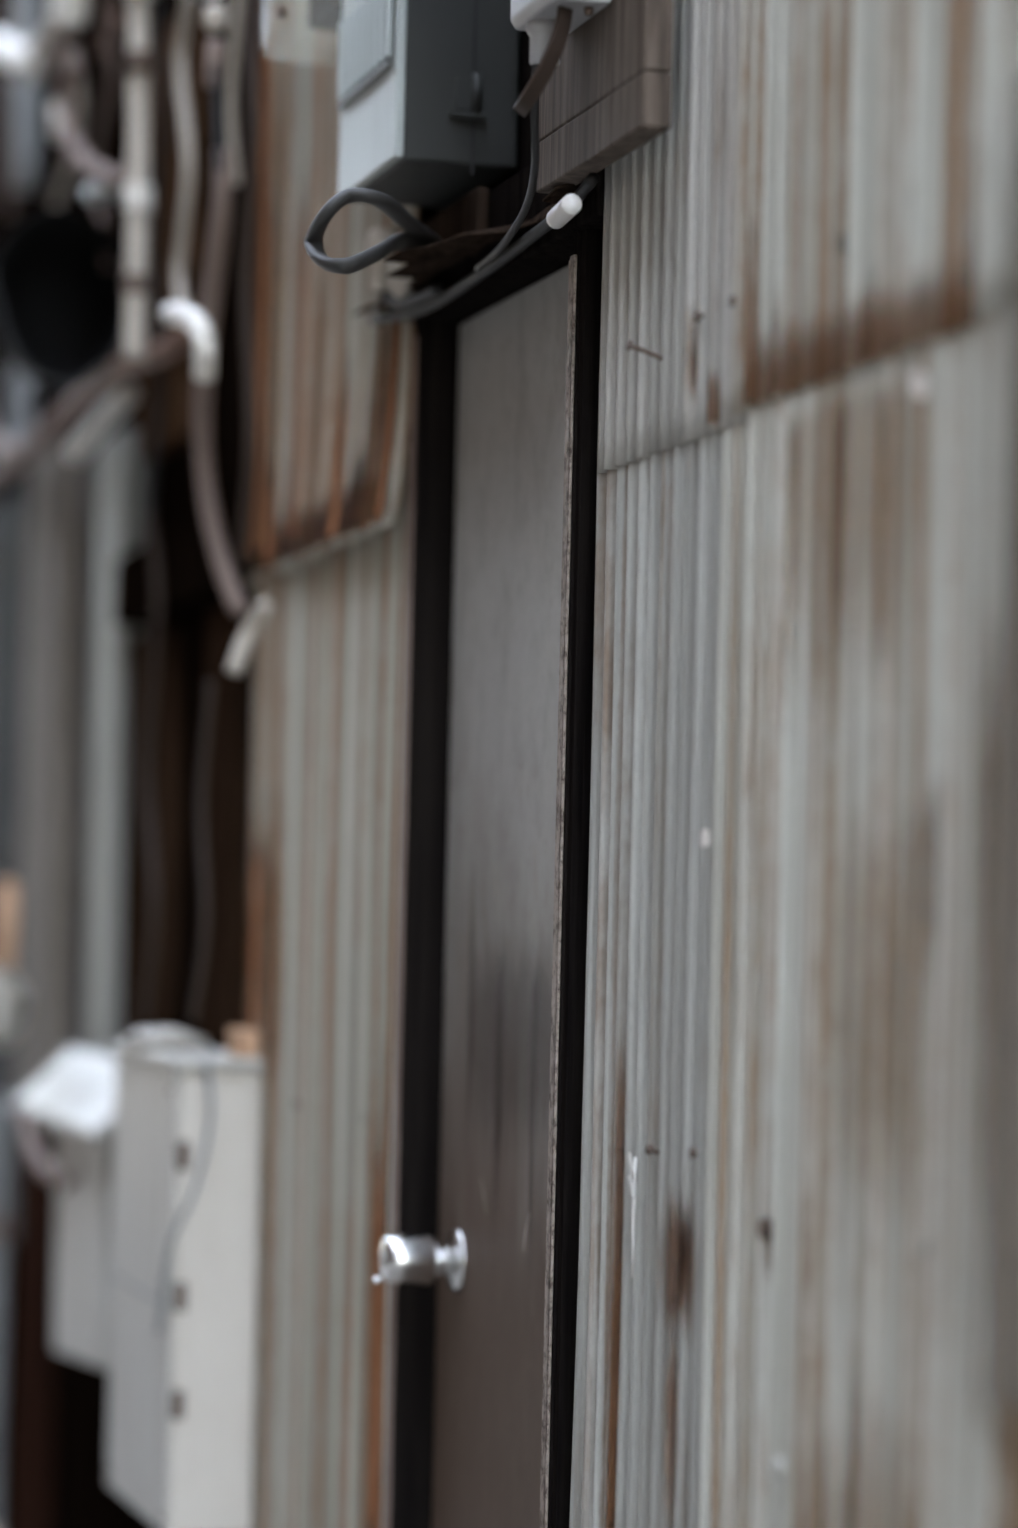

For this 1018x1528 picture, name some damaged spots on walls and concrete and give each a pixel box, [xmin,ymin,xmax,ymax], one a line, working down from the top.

corrosion [743,281,977,404]
corrosion [666,1215,693,1317]
corrosion [667,1360,679,1507]